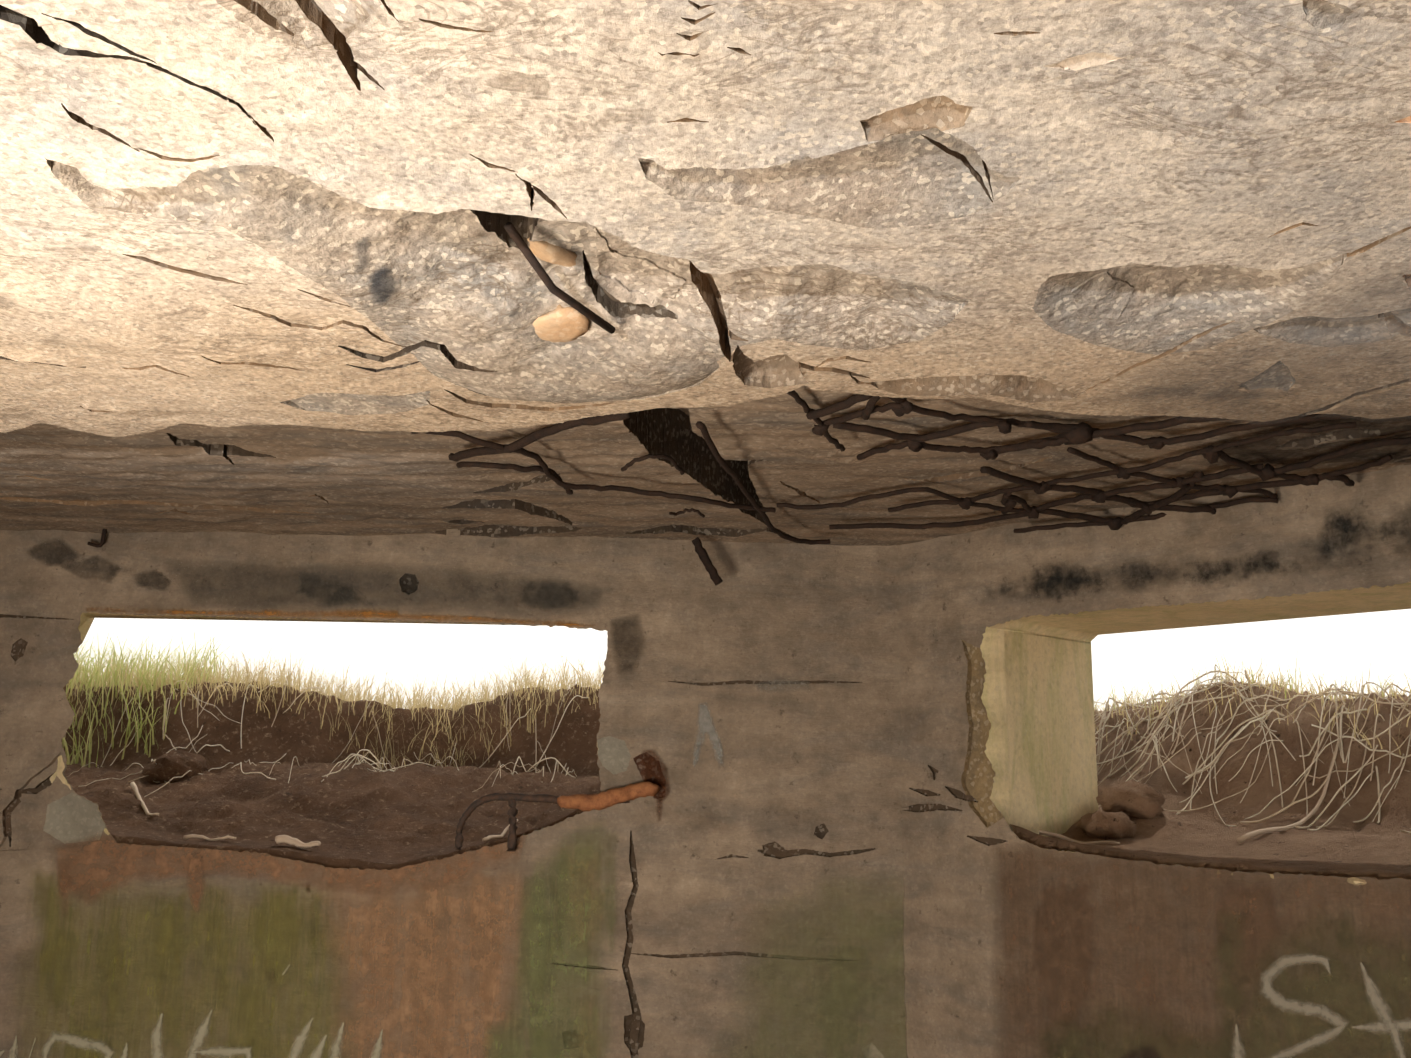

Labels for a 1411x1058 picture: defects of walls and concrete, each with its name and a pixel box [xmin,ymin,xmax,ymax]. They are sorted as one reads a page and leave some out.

crack [0,5,274,142]
crack [234,0,384,91]
crack [381,0,492,33]
crack [61,103,220,162]
spalling [638,95,1022,229]
crack [1268,222,1318,238]
crack [1347,226,1411,257]
peeling [0,157,1411,586]
crack [1281,378,1411,460]
crack [0,773,54,847]
corrosion [643,751,669,815]
crack [548,830,875,1058]